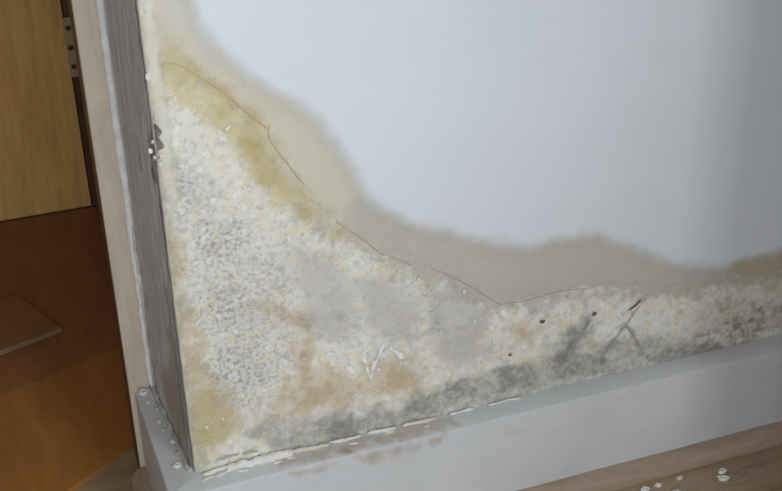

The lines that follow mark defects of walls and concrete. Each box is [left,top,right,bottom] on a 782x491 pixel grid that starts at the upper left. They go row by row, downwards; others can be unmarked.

peeling [103,0,198,472]
crack [162,62,305,185]
leakage [143,0,782,315]
peeling [160,62,782,482]
crack [601,300,643,360]